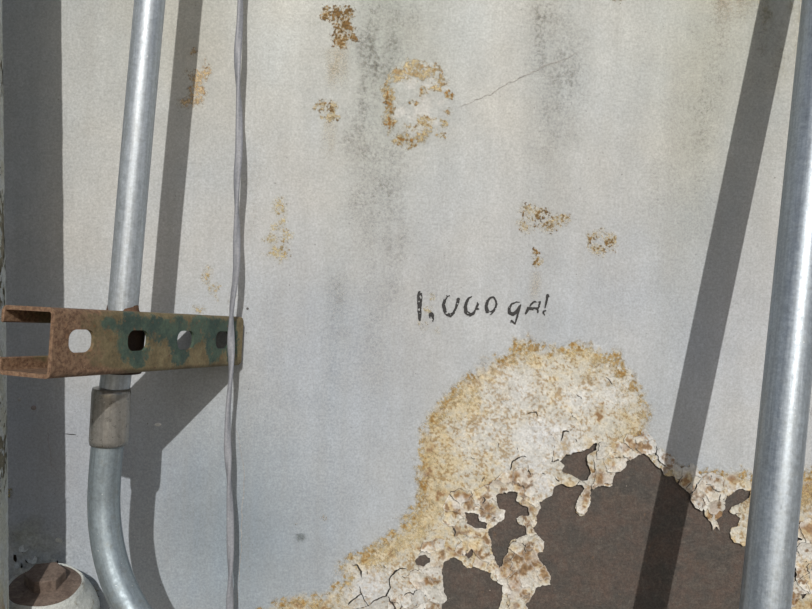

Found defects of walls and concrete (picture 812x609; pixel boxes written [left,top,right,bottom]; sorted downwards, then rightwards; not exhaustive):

corrosion [320,5,359,48]
corrosion [181,67,210,105]
corrosion [314,100,340,122]
corrosion [381,59,454,149]
crack [460,51,579,107]
corrosion [519,202,570,234]
corrosion [588,228,616,256]
peeling [237,328,754,609]
peeling [791,455,812,609]